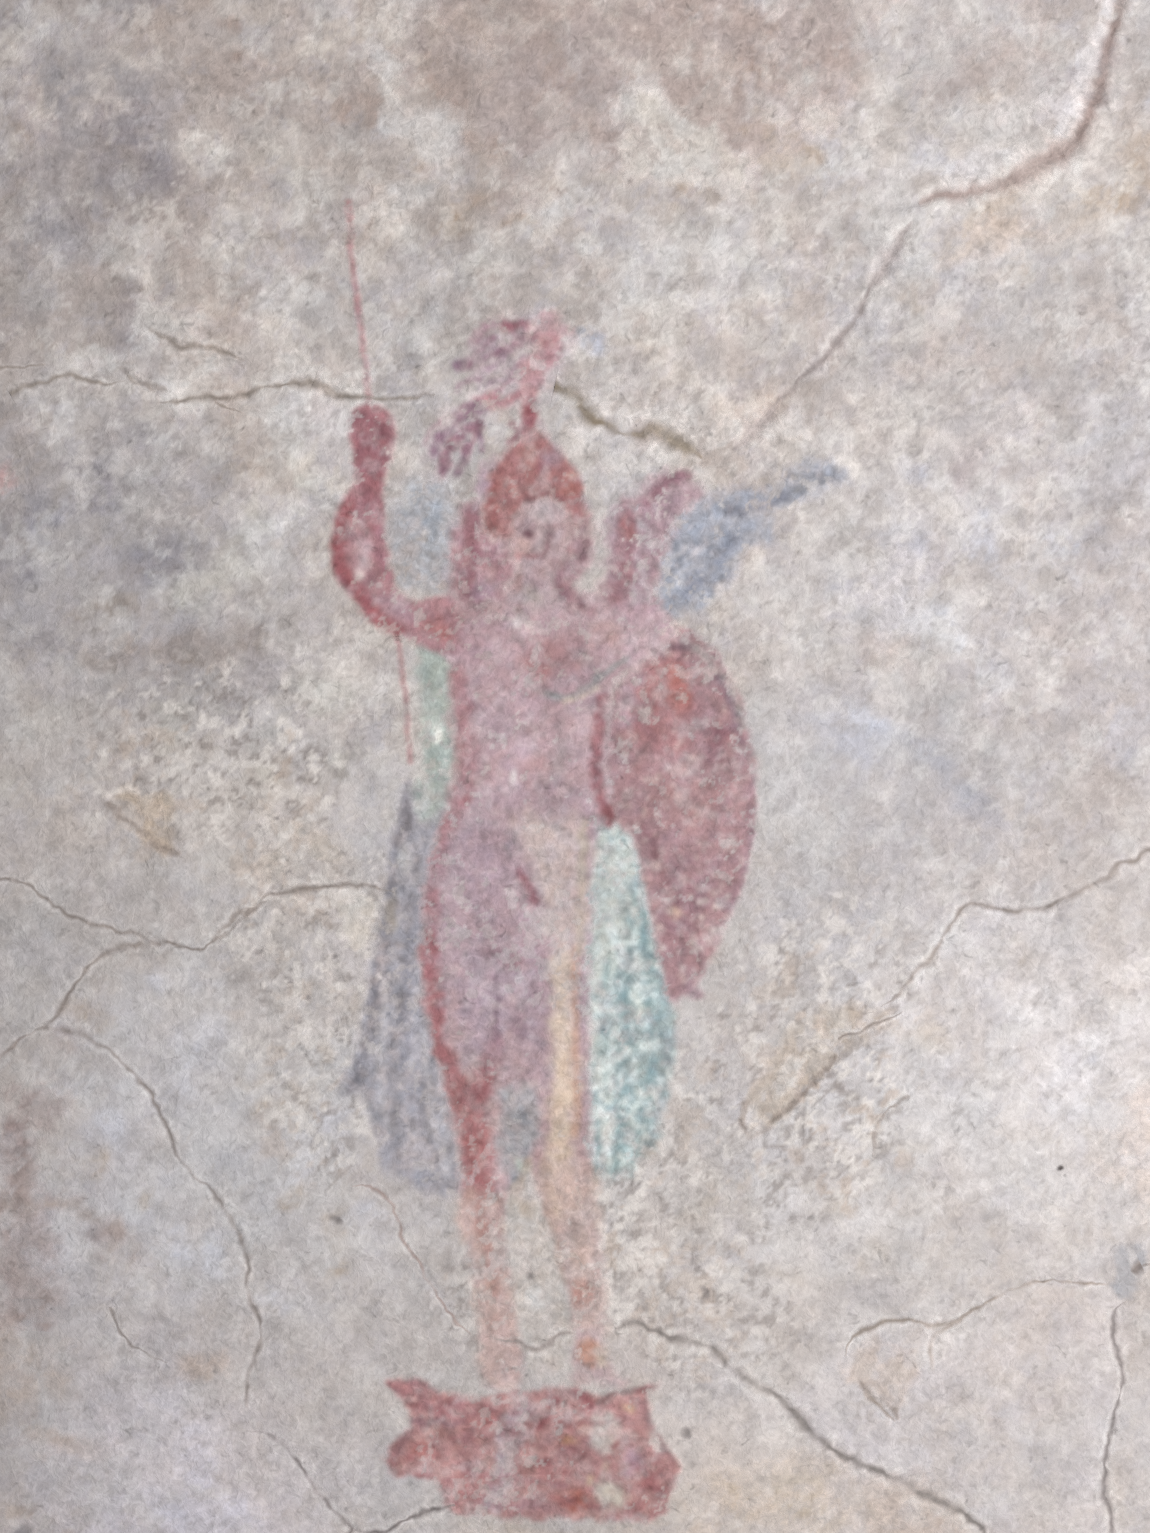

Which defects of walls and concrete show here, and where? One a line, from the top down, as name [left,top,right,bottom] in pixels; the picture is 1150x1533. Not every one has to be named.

crack [554,0,1124,458]
crack [0,333,421,411]
crack [838,848,1150,1040]
crack [0,877,455,1533]
crack [873,1095,910,1147]
crack [616,1319,986,1533]
crack [846,1261,1150,1533]